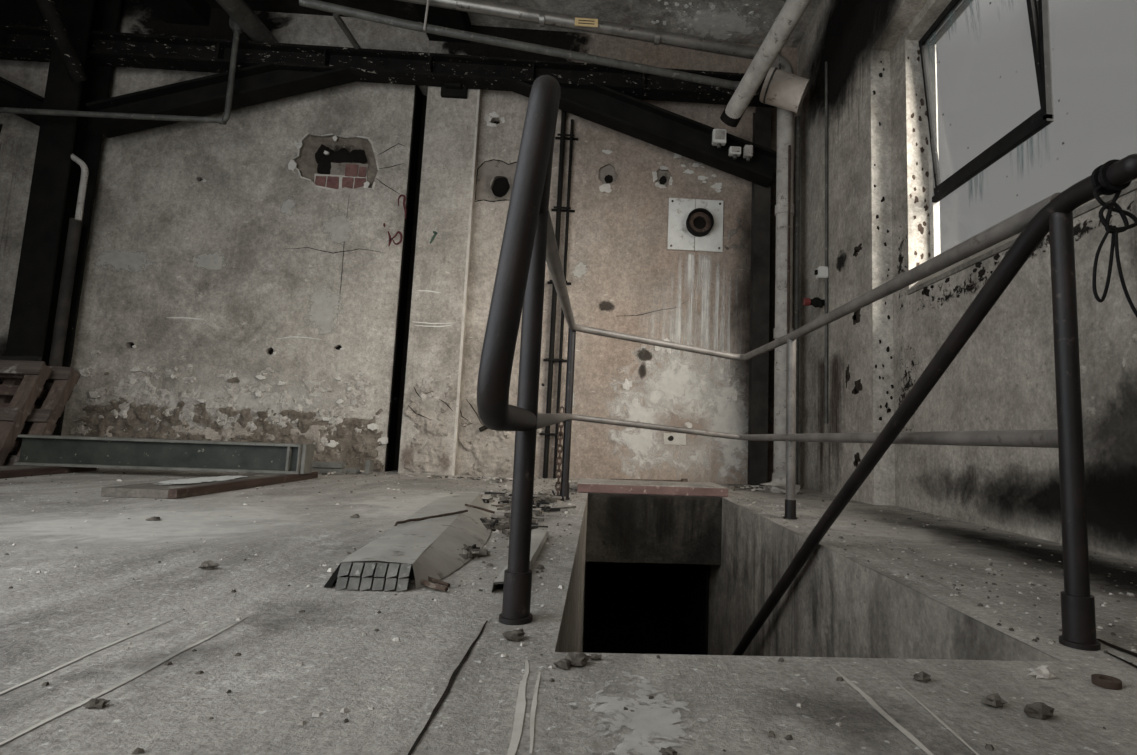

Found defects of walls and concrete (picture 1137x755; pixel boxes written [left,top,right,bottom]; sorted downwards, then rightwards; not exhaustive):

flaking render [288,133,404,194]
flaking render [70,350,388,471]
flaking render [404,377,515,477]
water stain [610,221,751,477]
water stain [768,181,776,461]
water stain [897,226,908,274]
water stain [899,345,919,405]
water stain [899,251,1008,310]
water stain [946,474,1061,523]
water stain [1073,201,1134,241]
water stain [1085,382,1137,548]
crack [408,621,487,755]